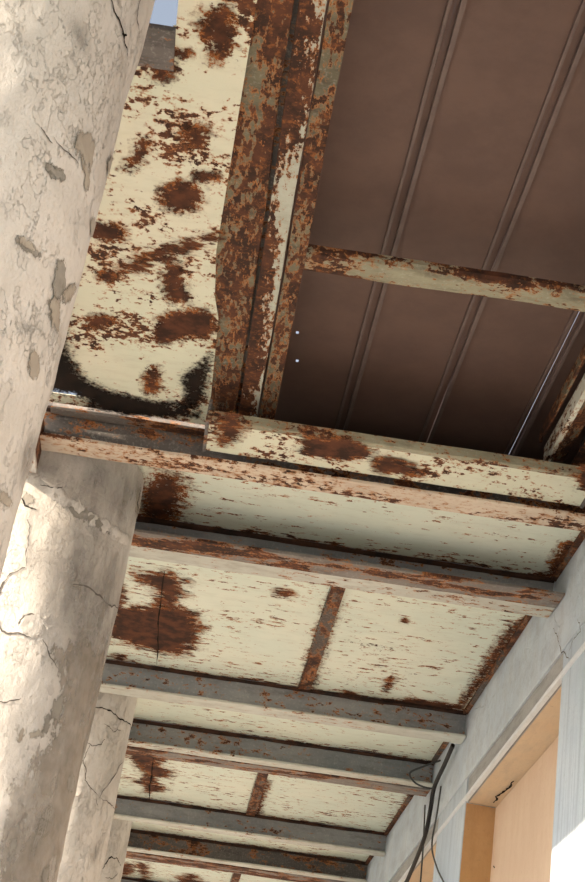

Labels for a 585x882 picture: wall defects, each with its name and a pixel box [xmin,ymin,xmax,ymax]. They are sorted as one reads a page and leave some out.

rust [149,3,242,86]
flaking render [45,161,66,182]
flaking render [74,131,95,192]
rust [153,170,227,216]
flaking render [15,235,42,258]
flaking render [48,259,77,332]
rust [93,231,226,346]
crack [0,520,30,594]
crack [0,627,31,638]
crack [71,568,118,609]
rust [111,566,214,662]
crack [83,707,132,809]